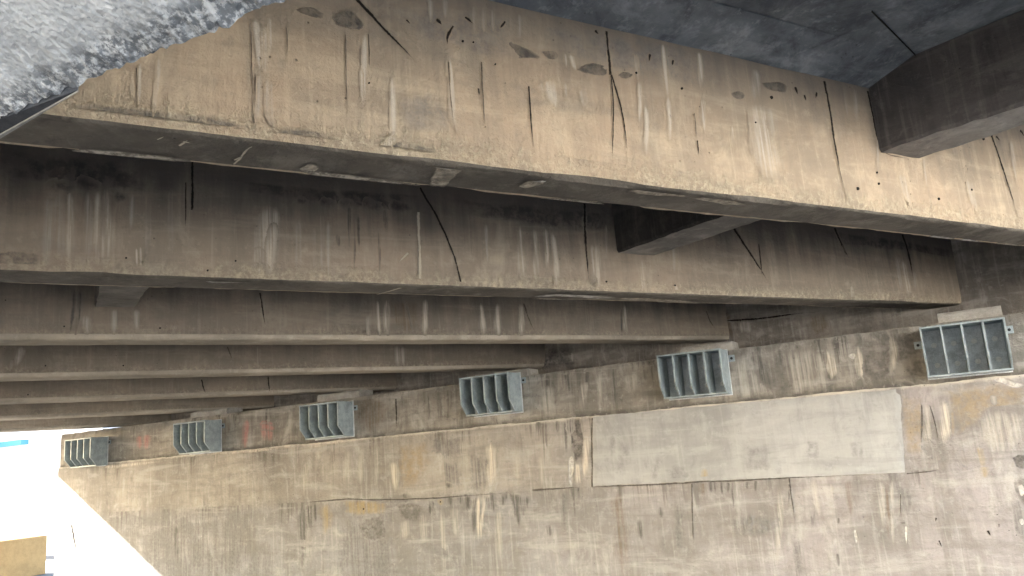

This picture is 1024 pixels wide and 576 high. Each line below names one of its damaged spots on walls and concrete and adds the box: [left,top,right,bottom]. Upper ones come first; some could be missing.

peeling [296,7,365,30]
crack [345,0,414,115]
crack [477,62,486,124]
crack [527,86,535,147]
peeling [509,41,559,60]
peeling [577,63,637,79]
crack [603,30,628,173]
crack [821,80,848,199]
crack [990,135,1020,220]
crack [376,187,463,295]
crack [582,203,590,282]
crack [732,228,771,287]